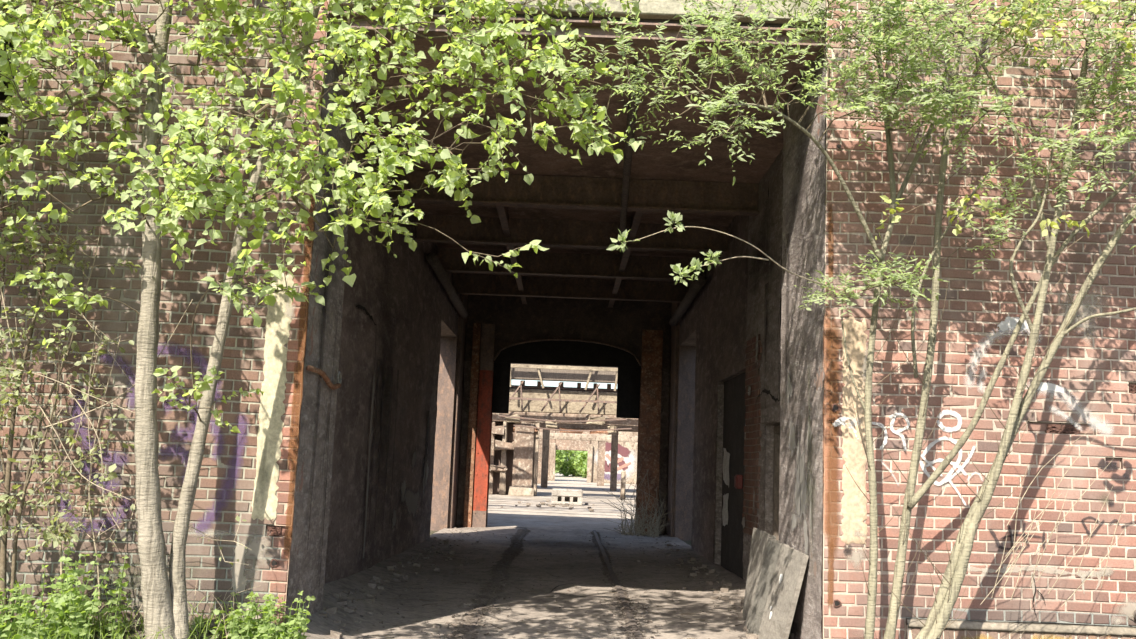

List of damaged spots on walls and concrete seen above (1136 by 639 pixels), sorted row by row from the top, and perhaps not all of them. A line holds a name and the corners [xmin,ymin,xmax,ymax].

corrosion [824,316,839,605]